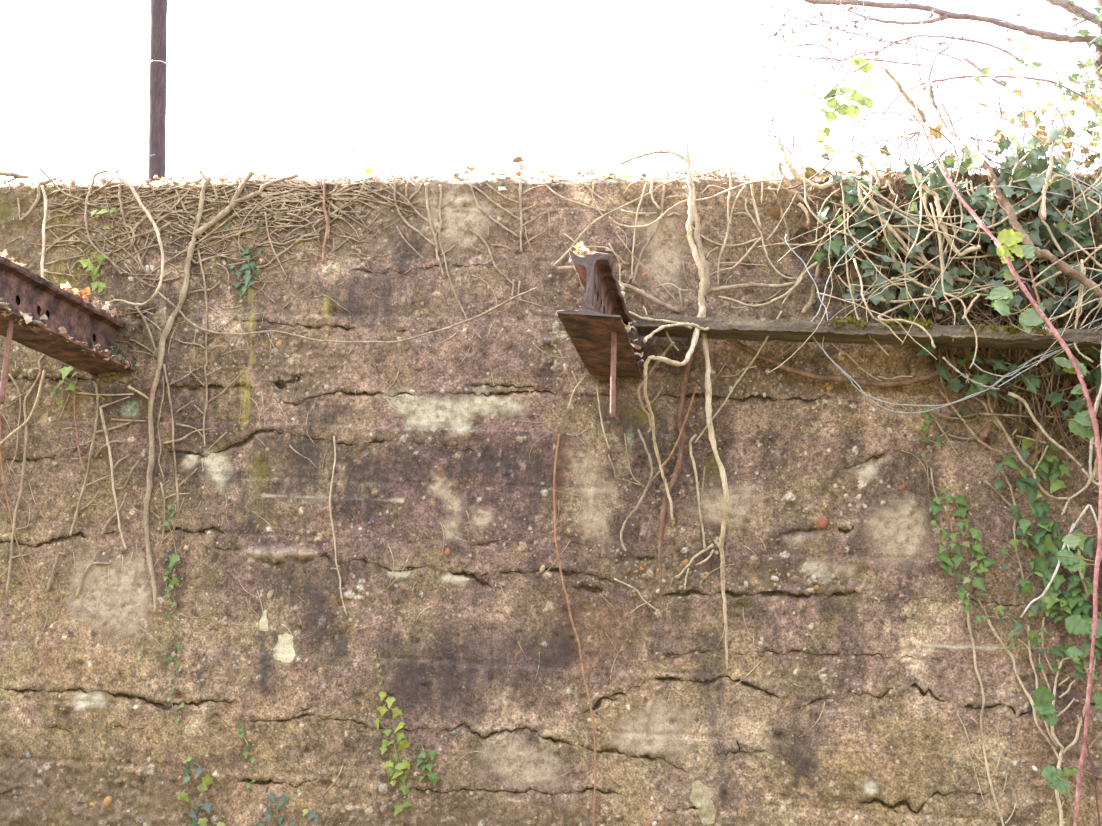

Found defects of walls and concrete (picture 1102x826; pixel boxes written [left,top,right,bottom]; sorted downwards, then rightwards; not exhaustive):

crack [0,684,233,732]
crack [250,648,1028,773]
crack [237,778,317,793]
crack [409,784,625,799]